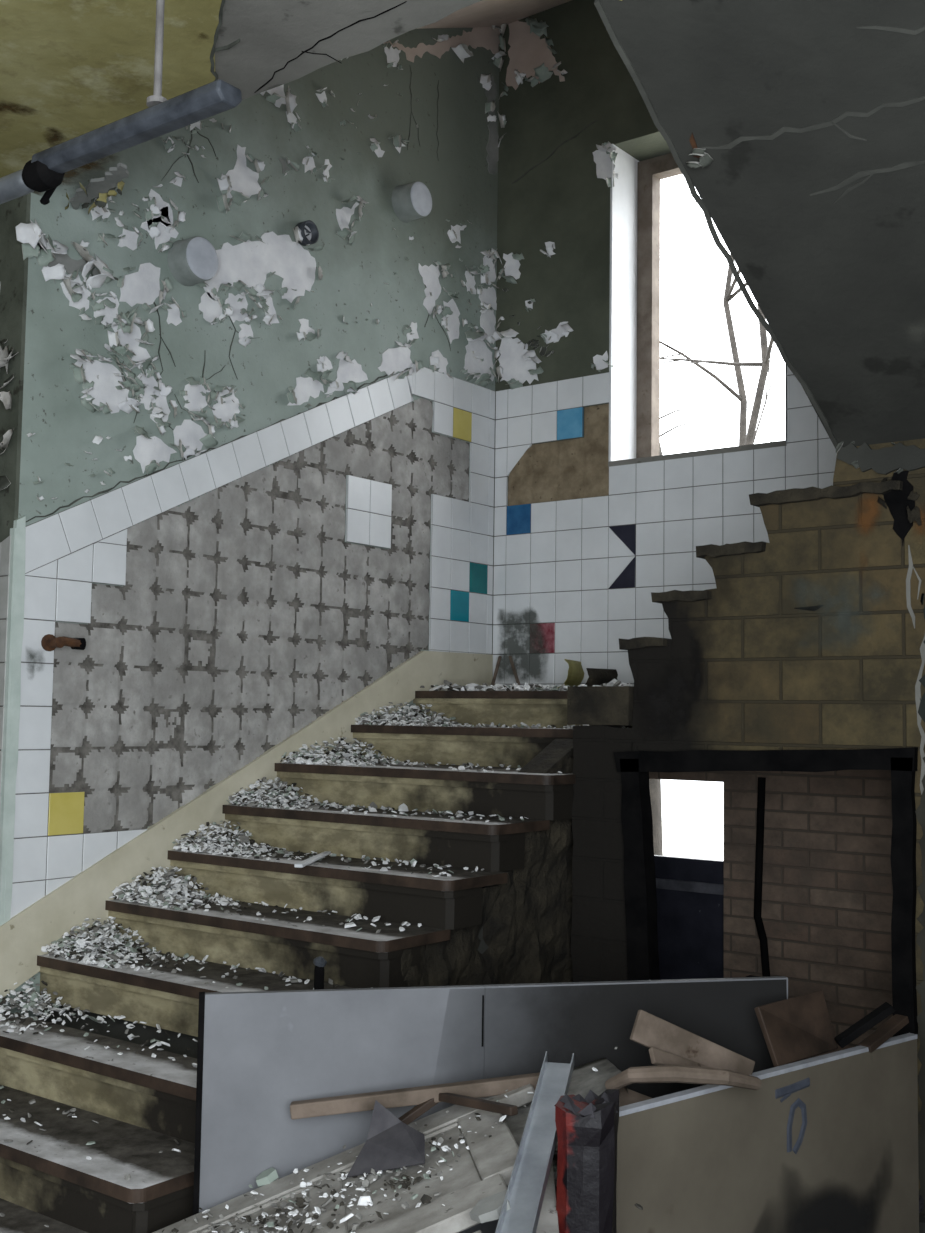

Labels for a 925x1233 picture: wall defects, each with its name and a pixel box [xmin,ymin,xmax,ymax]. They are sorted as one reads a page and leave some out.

leakage [0,103,31,113]
peeling [0,0,222,178]
peeling [160,118,409,213]
crack [254,1,407,93]
peeling [383,17,568,174]
crack [702,96,925,149]
crack [810,160,925,204]
crack [856,26,925,35]
peeling [15,163,324,493]
peeling [287,219,574,408]
spalling [591,0,925,546]
peeling [508,404,609,506]